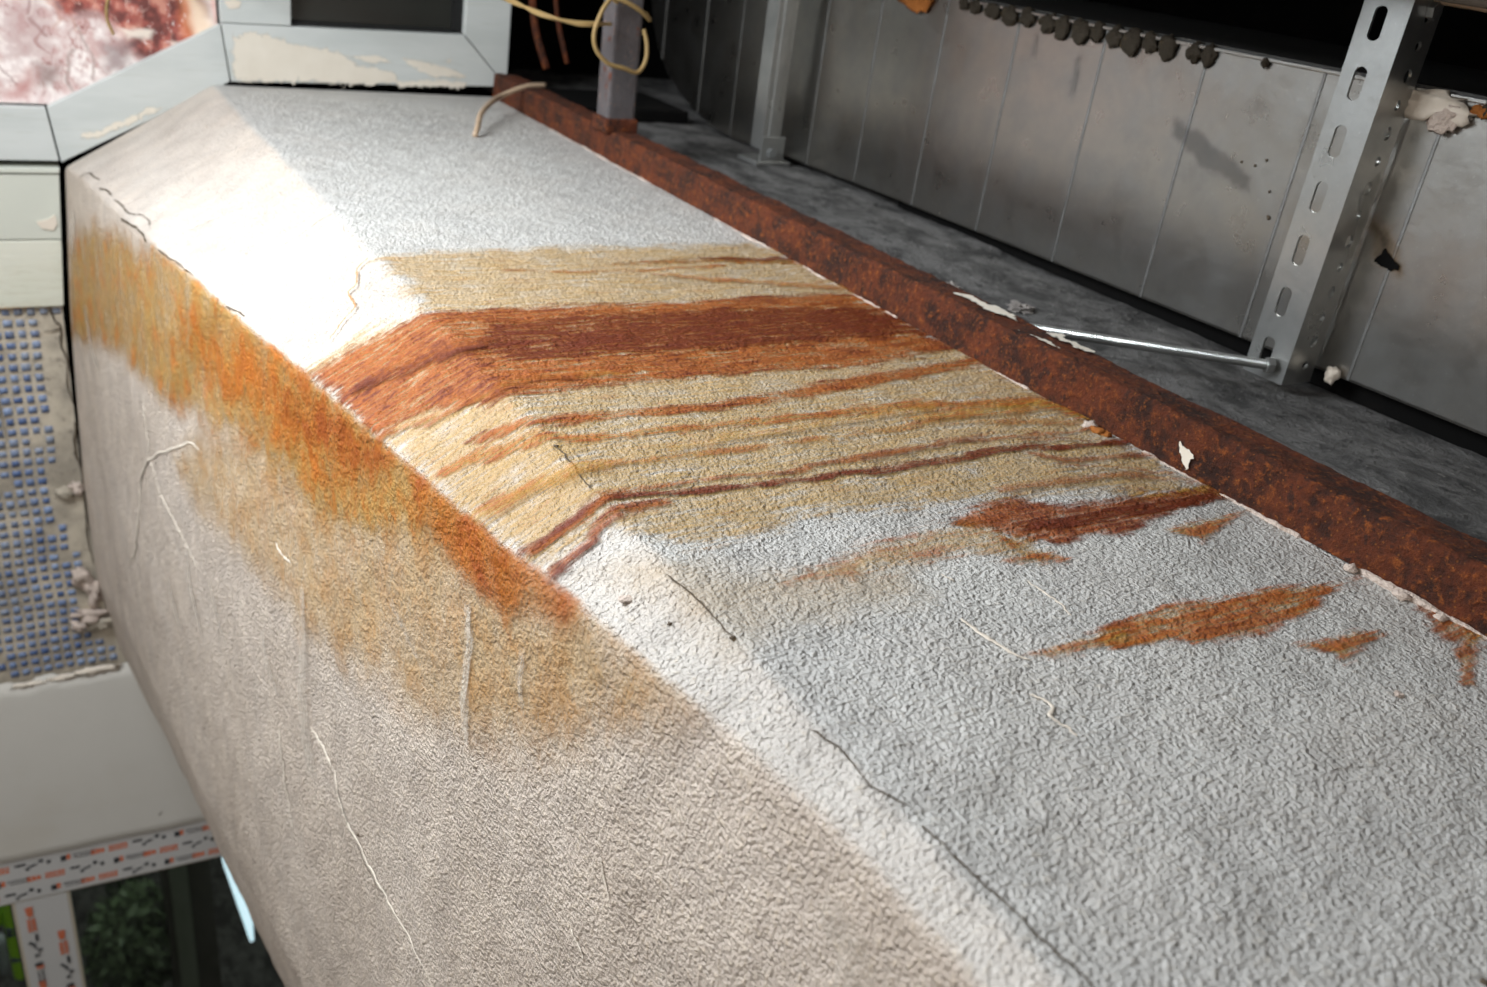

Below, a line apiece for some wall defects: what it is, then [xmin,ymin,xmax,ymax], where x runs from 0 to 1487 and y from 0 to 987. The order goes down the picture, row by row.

peeling [231,31,466,90]
crack [80,172,191,274]
corrosion [309,243,1238,580]
corrosion [1038,581,1341,655]
corrosion [1300,628,1384,659]
corrosion [1416,606,1482,685]